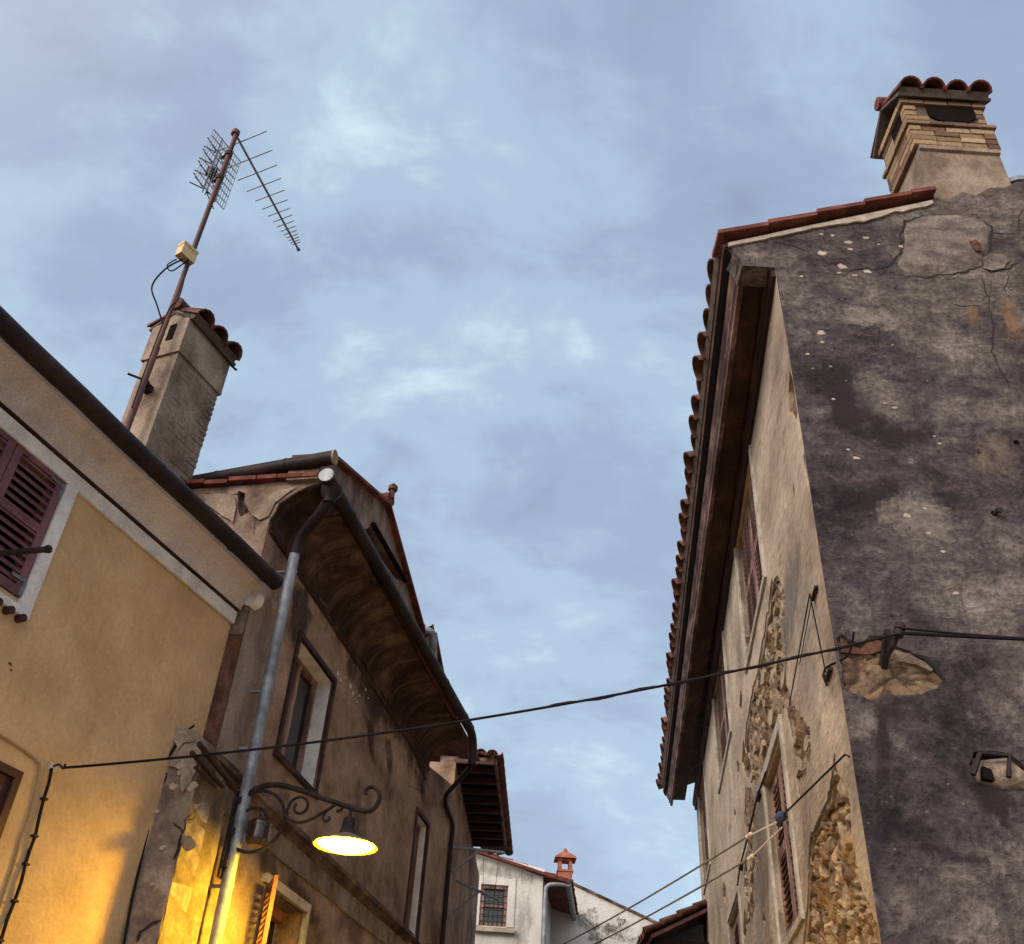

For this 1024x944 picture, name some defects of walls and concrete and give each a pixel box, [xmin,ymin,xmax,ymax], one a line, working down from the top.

damp [849,308,897,330]
crack [775,209,1024,391]
damp [813,365,933,444]
spalling [833,633,947,701]
flaking render [168,770,198,792]
spalling [738,577,811,944]
spalling [181,834,197,851]
spalling [805,759,881,944]